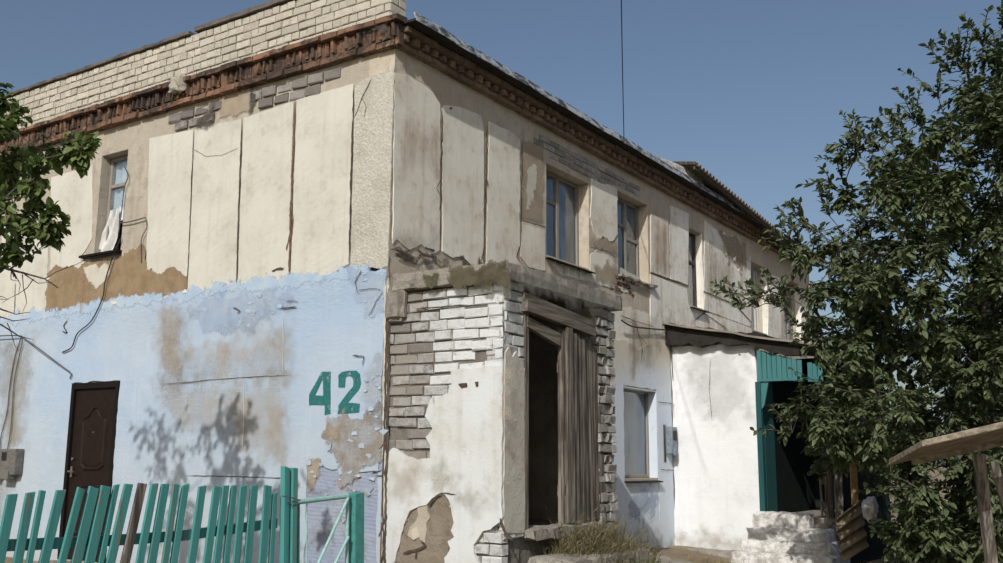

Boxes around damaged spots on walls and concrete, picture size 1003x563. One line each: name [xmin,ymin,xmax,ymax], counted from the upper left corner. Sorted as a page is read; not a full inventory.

crack [272,105,295,274]
flaking render [522,134,640,222]
flaking render [45,244,188,312]
spalling [304,375,389,563]
spalling [397,493,454,563]